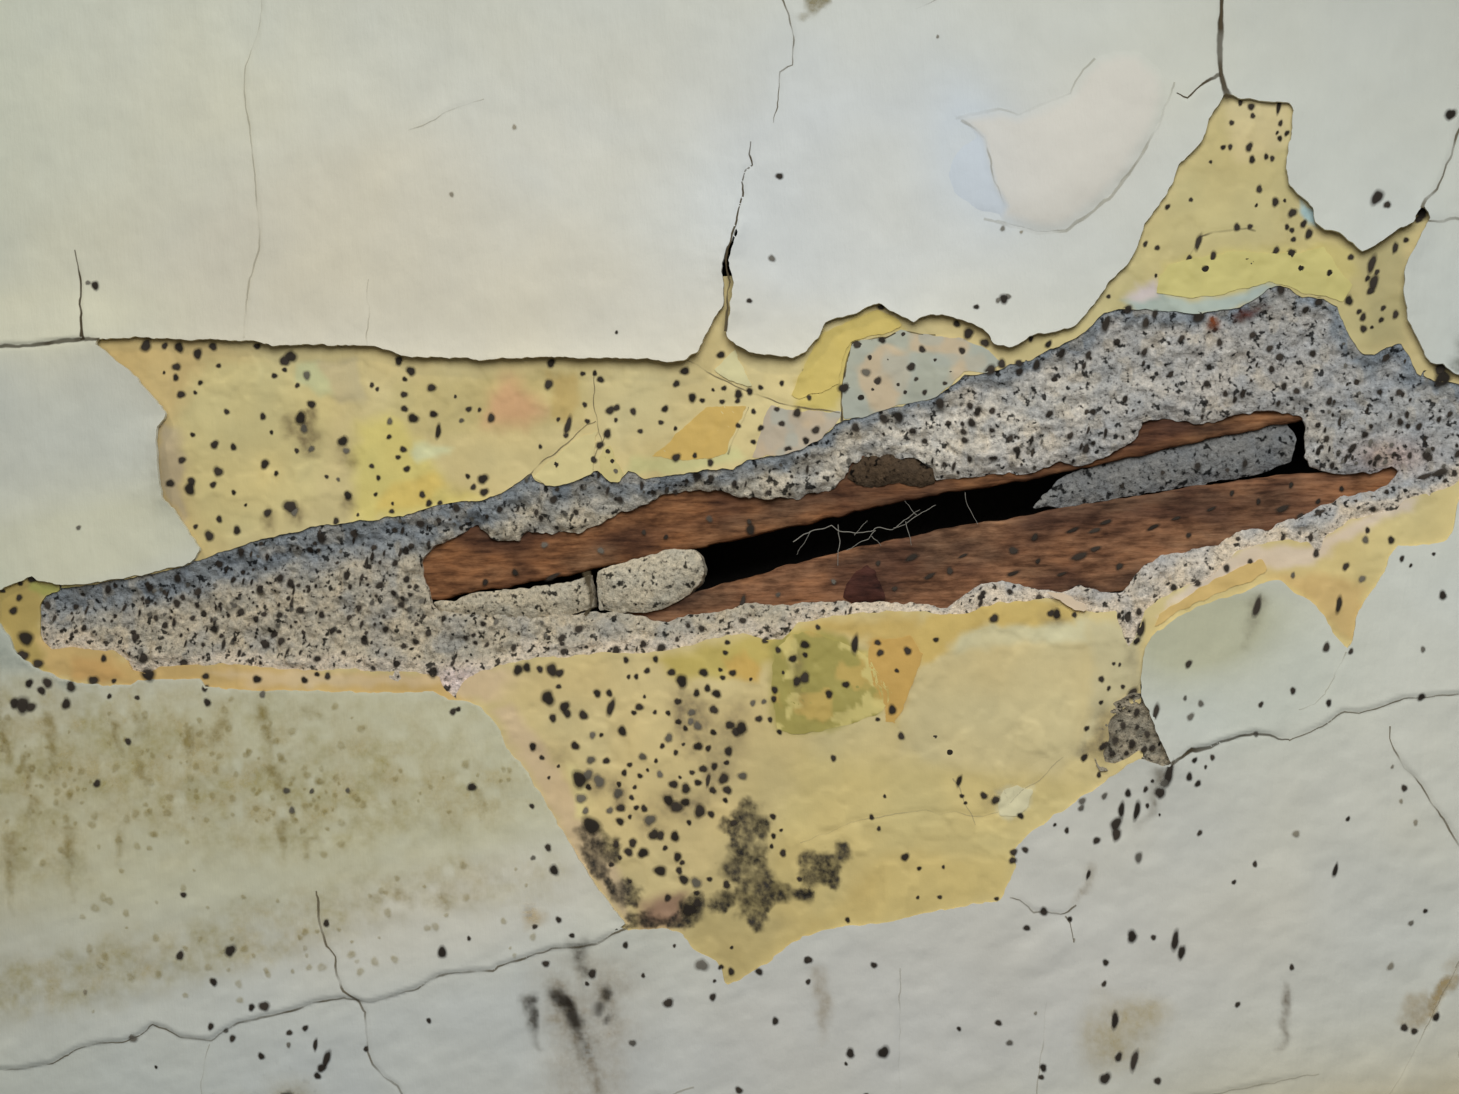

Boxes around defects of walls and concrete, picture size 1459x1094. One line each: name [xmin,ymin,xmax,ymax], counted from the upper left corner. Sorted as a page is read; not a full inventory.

crack [1177,0,1231,99]
crack [724,0,795,331]
crack [0,250,100,348]
spalling [0,95,1459,700]
damp [673,367,811,444]
damp [838,332,1125,474]
damp [1204,332,1459,483]
damp [10,457,587,718]
damp [511,621,850,948]
peeling [456,592,1171,984]
crack [1170,695,1454,837]
crack [281,891,366,1014]